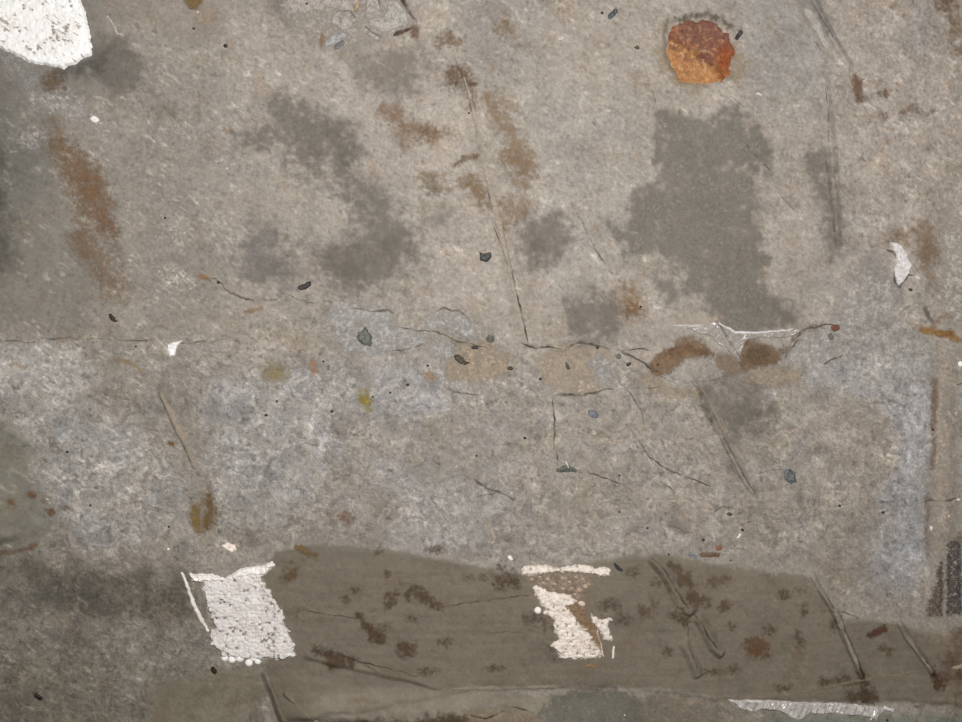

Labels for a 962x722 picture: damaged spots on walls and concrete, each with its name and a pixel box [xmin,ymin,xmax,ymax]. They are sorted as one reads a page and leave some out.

water stain [321,162,412,287]
water stain [609,107,795,336]
crack [506,260,598,352]
rust [649,336,794,376]
rust [384,585,440,610]
rust [314,648,354,669]
rust [355,613,385,644]
peeling [591,616,615,659]
rust [867,625,892,653]
rust [821,673,878,703]